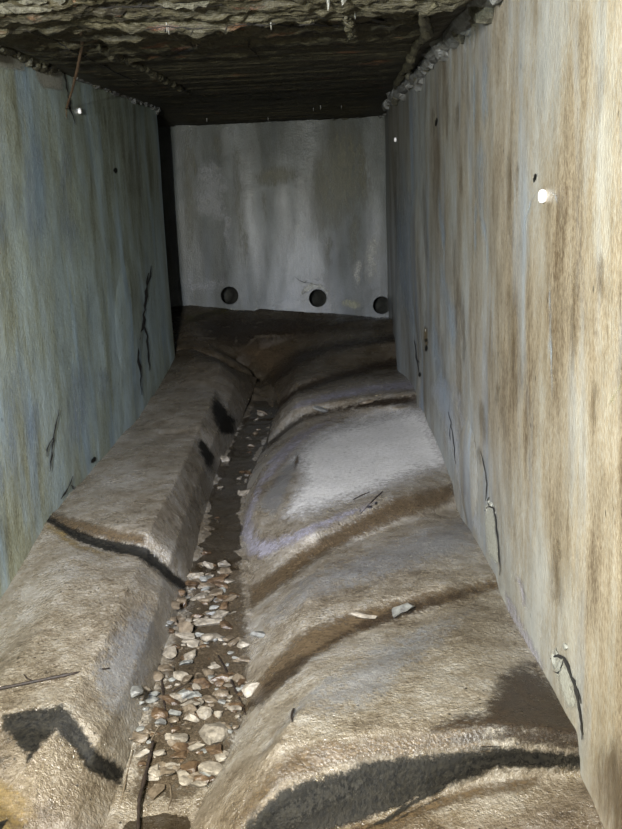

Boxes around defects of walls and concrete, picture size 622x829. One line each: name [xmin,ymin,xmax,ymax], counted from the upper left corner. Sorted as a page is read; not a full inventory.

spalling [0,0,66,14]
spalling [154,1,209,11]
spalling [0,44,161,115]
spalling [378,0,502,118]
crack [137,265,152,391]
crack [46,409,59,470]
crack [448,412,456,463]
crack [480,452,500,575]
leakage [242,598,580,829]
crack [550,654,583,740]